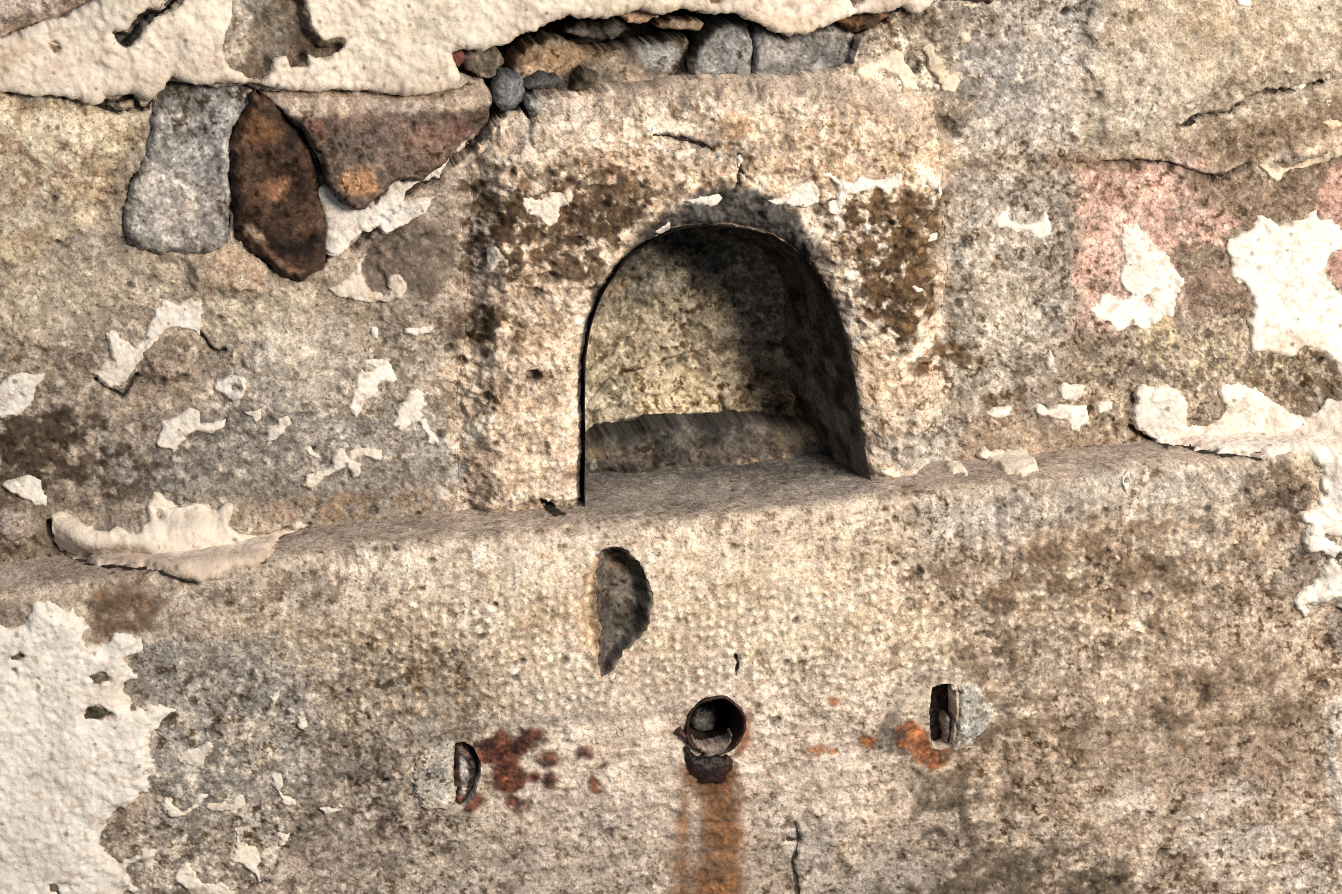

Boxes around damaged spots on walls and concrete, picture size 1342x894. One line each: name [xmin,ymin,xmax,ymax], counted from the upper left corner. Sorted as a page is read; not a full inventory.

peeling [0,0,934,105]
crack [1176,79,1323,127]
crack [1104,159,1246,182]
peeling [1089,223,1184,332]
peeling [1226,210,1342,376]
peeling [1130,382,1342,617]
peeling [0,601,176,894]
corrosion [464,728,558,814]
corrosion [578,746,608,794]
corrosion [673,714,752,894]
corrosion [859,736,877,748]
corrosion [894,721,949,771]